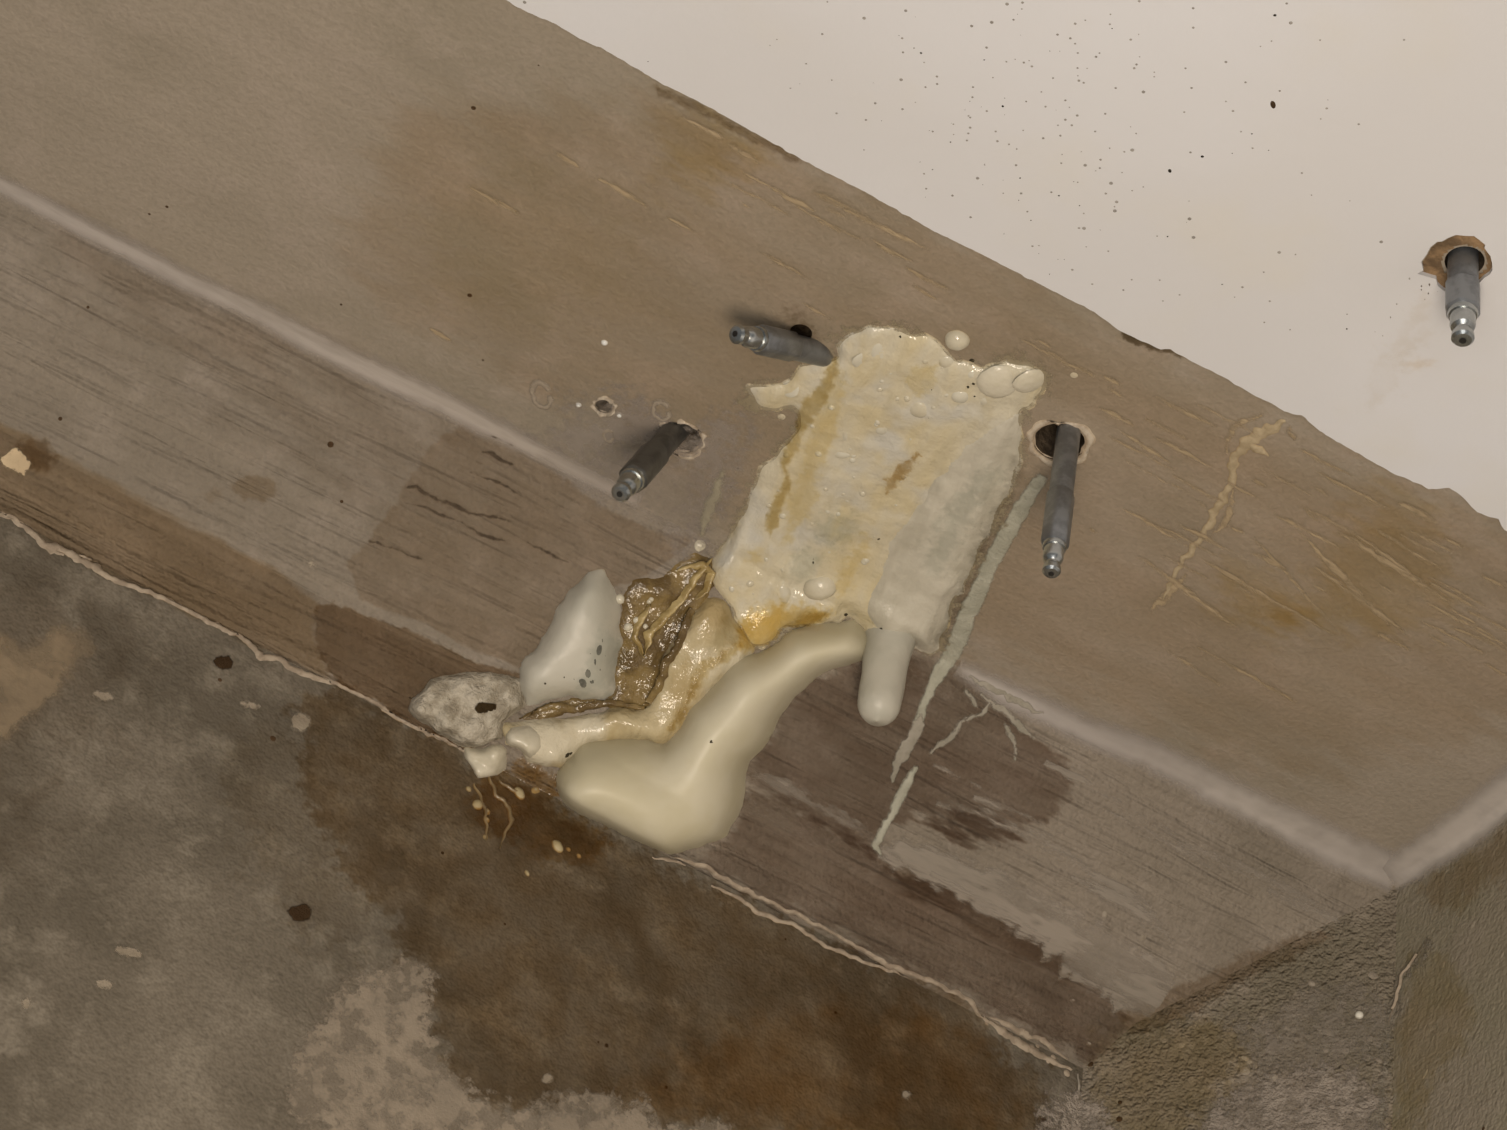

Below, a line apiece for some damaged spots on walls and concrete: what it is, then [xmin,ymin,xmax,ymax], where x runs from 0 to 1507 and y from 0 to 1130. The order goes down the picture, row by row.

crack [407,436,558,559]
crack [0,511,464,752]
efflorescence [287,953,731,1130]
crack [652,857,1080,1130]
water stain [878,838,1175,1013]
water stain [973,795,1167,933]